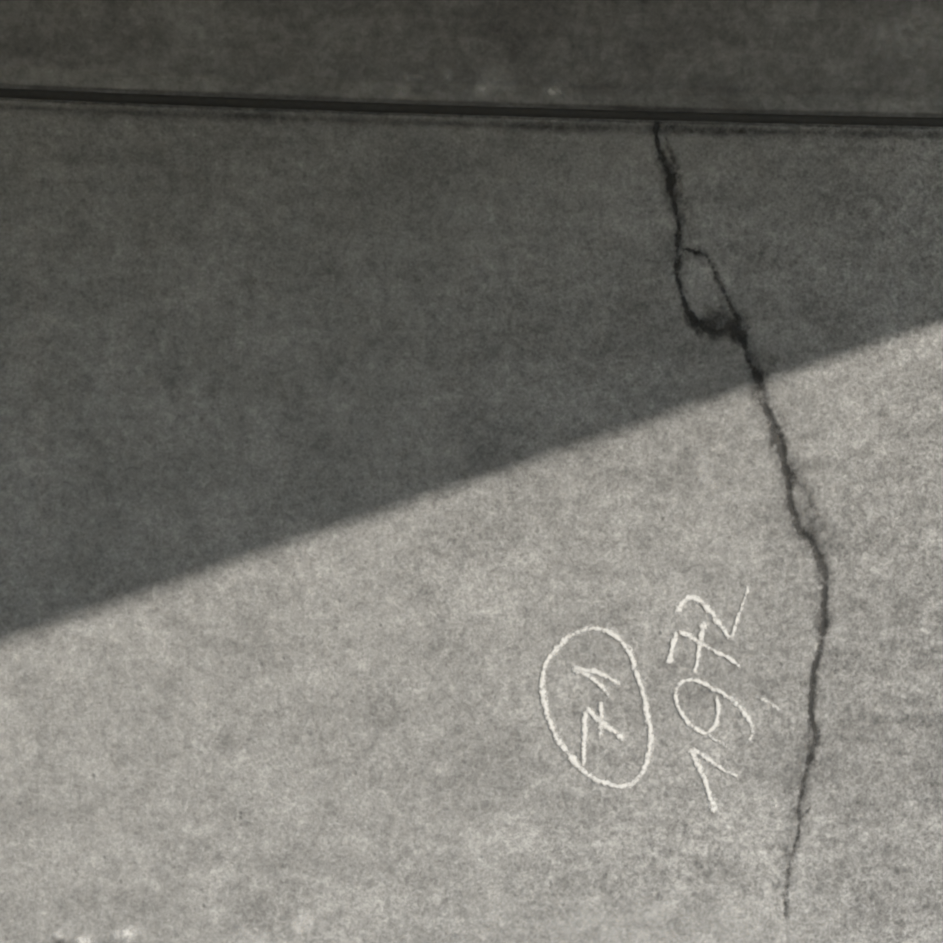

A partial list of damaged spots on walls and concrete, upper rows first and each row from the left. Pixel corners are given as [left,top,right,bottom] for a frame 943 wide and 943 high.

crack [653,122,832,916]